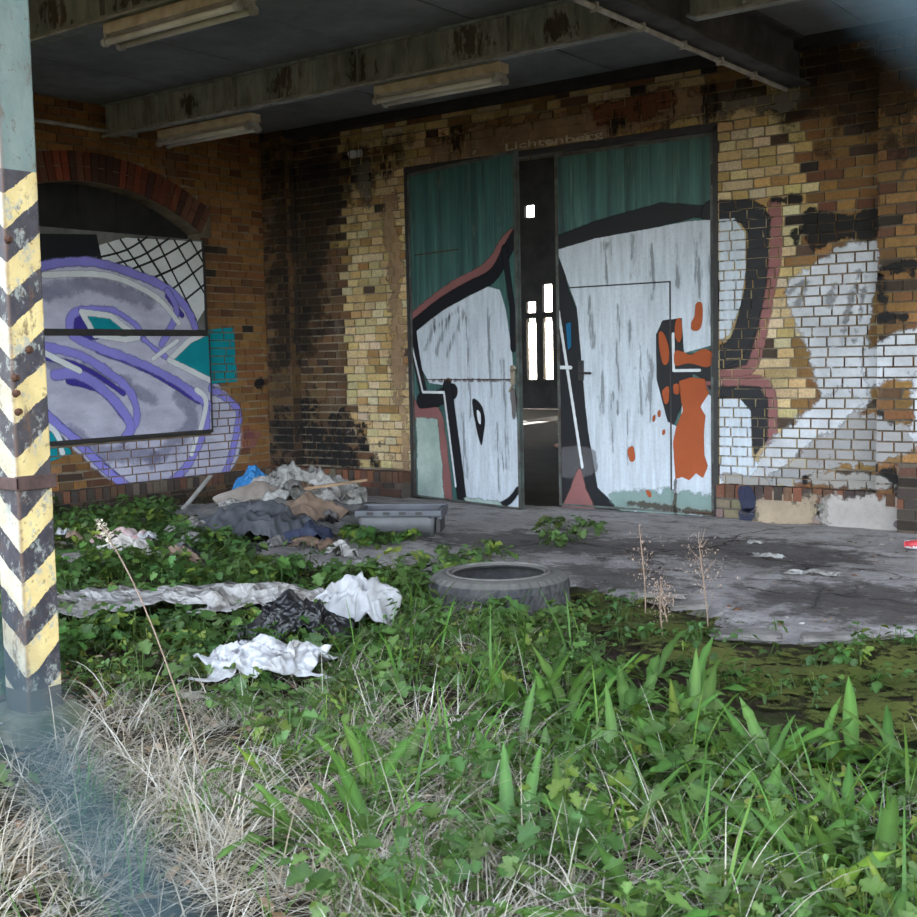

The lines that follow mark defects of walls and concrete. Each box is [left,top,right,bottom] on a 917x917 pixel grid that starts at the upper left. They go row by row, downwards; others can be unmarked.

rust [544,6,579,43]
spalling [753,488,898,531]